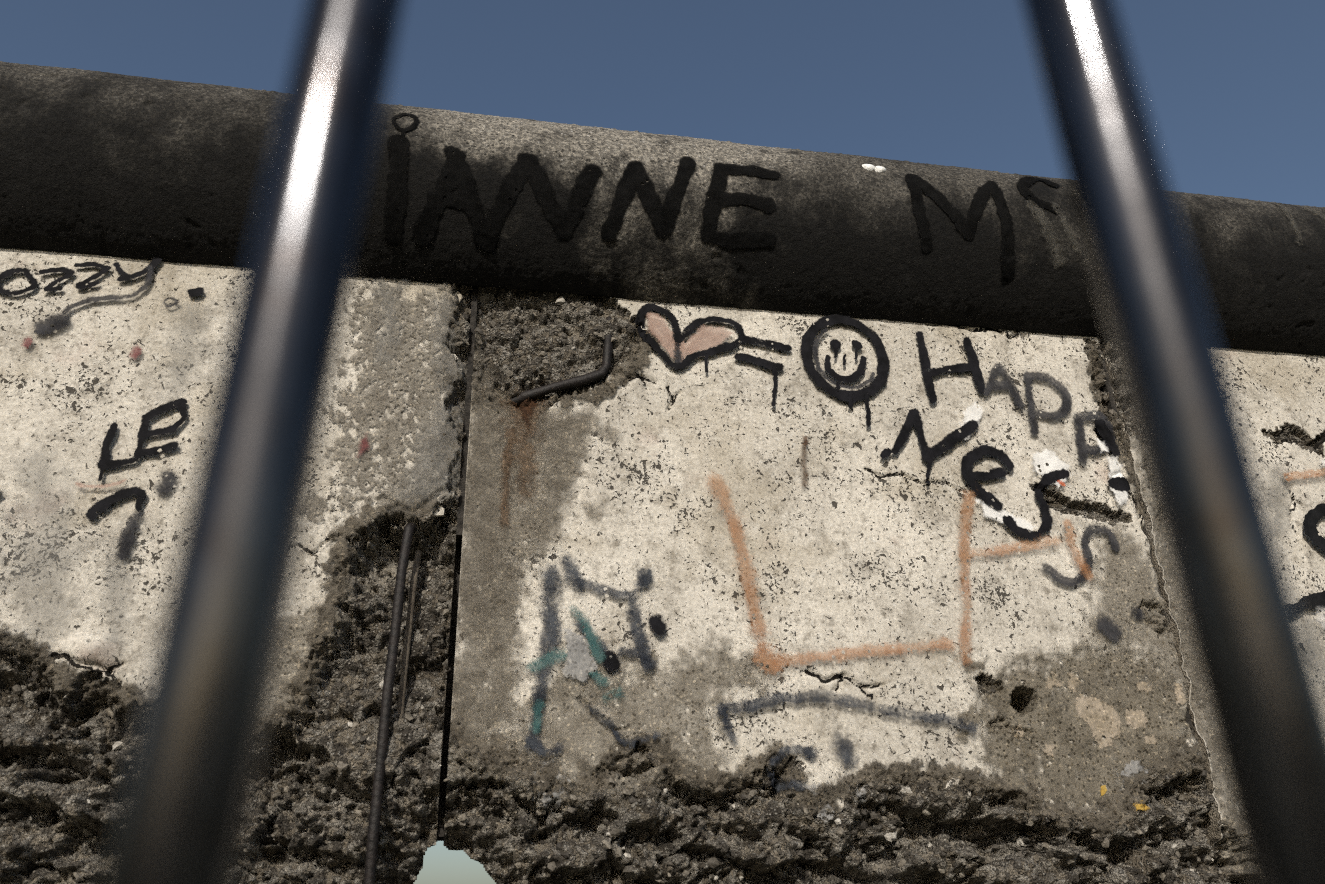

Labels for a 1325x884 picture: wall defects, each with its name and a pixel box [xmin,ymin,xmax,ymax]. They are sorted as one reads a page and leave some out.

spalling [0,621,143,884]
leakage [463,397,527,615]
corrosion [501,397,538,524]
spalling [239,279,1252,884]
crack [804,670,880,699]